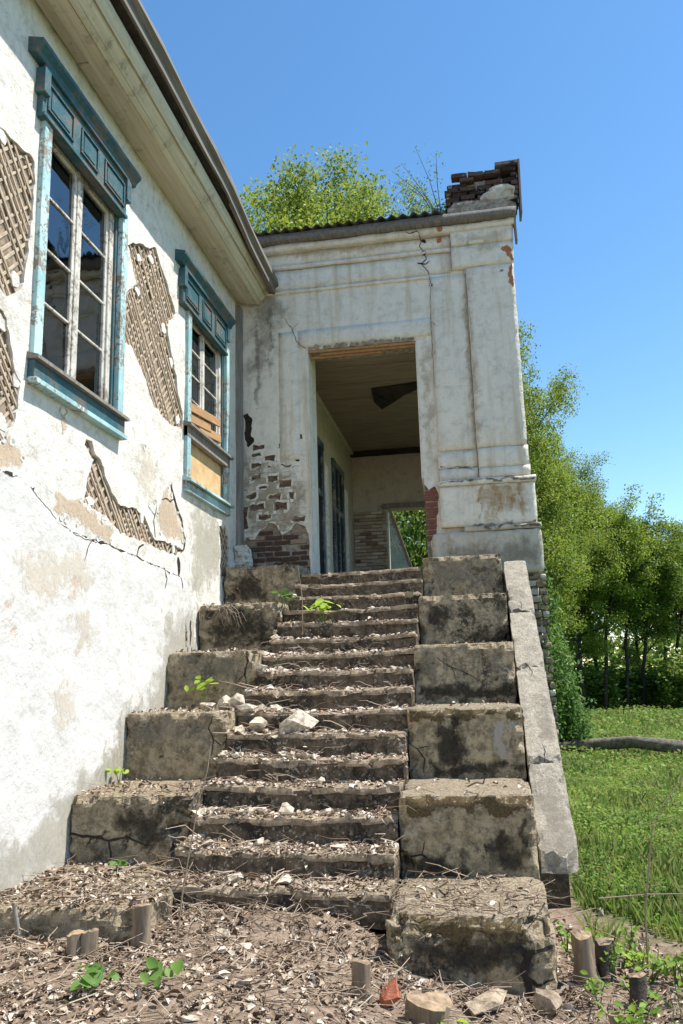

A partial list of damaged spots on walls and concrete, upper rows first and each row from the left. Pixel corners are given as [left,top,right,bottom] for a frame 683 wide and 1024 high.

flaking render [0,313,25,469]
flaking render [0,128,34,297]
flaking render [125,243,181,429]
crack [407,227,435,381]
spalling [501,245,514,287]
crack [0,470,186,588]
flaking render [53,441,185,585]
flaking render [243,414,310,570]
flaking render [424,486,439,541]
crack [70,833,149,861]
leakage [404,849,469,878]
leakage [486,819,531,870]